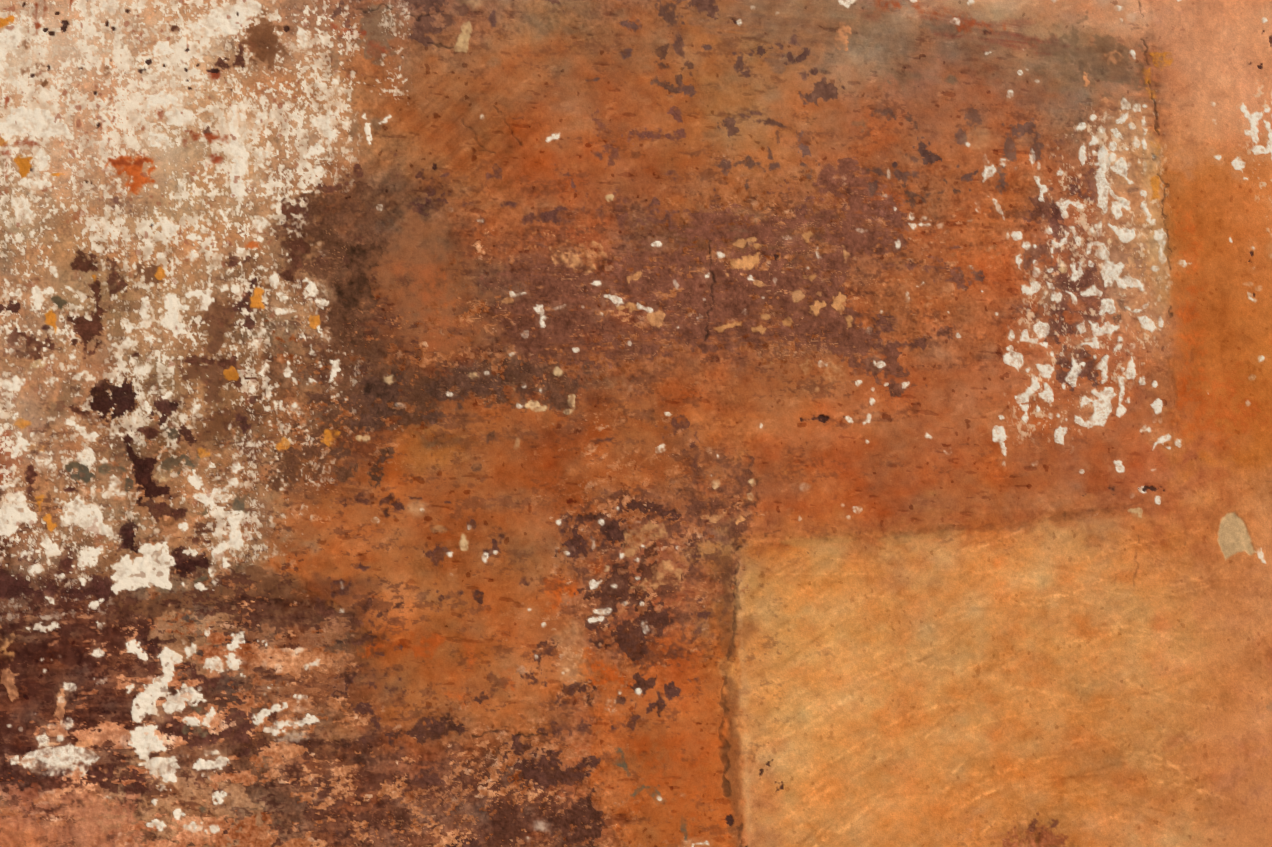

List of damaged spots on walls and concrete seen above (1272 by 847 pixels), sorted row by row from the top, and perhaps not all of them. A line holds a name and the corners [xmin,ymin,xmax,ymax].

peeling [1213,61,1272,304]
water stain [0,419,40,501]
water stain [0,298,56,361]
water stain [46,248,266,500]
water stain [421,542,452,568]
peeling [0,0,986,847]
peeling [959,96,1193,467]
peeling [1106,459,1165,519]
corrosion [1150,166,1272,460]
spalling [1216,511,1257,562]
water stain [311,559,469,753]
spalling [1002,811,1075,847]